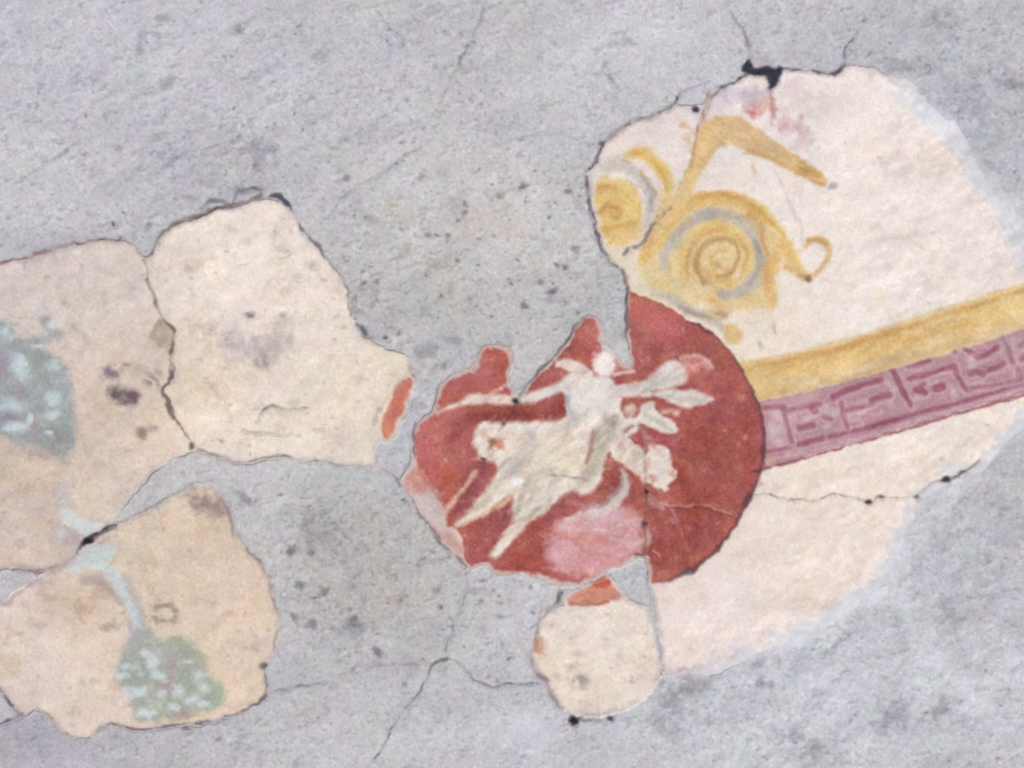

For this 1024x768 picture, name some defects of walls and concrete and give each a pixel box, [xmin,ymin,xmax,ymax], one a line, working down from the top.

crack [129,258,197,452]
crack [753,458,981,506]
crack [18,483,192,575]
crack [265,571,542,761]
peeling [530,633,548,658]